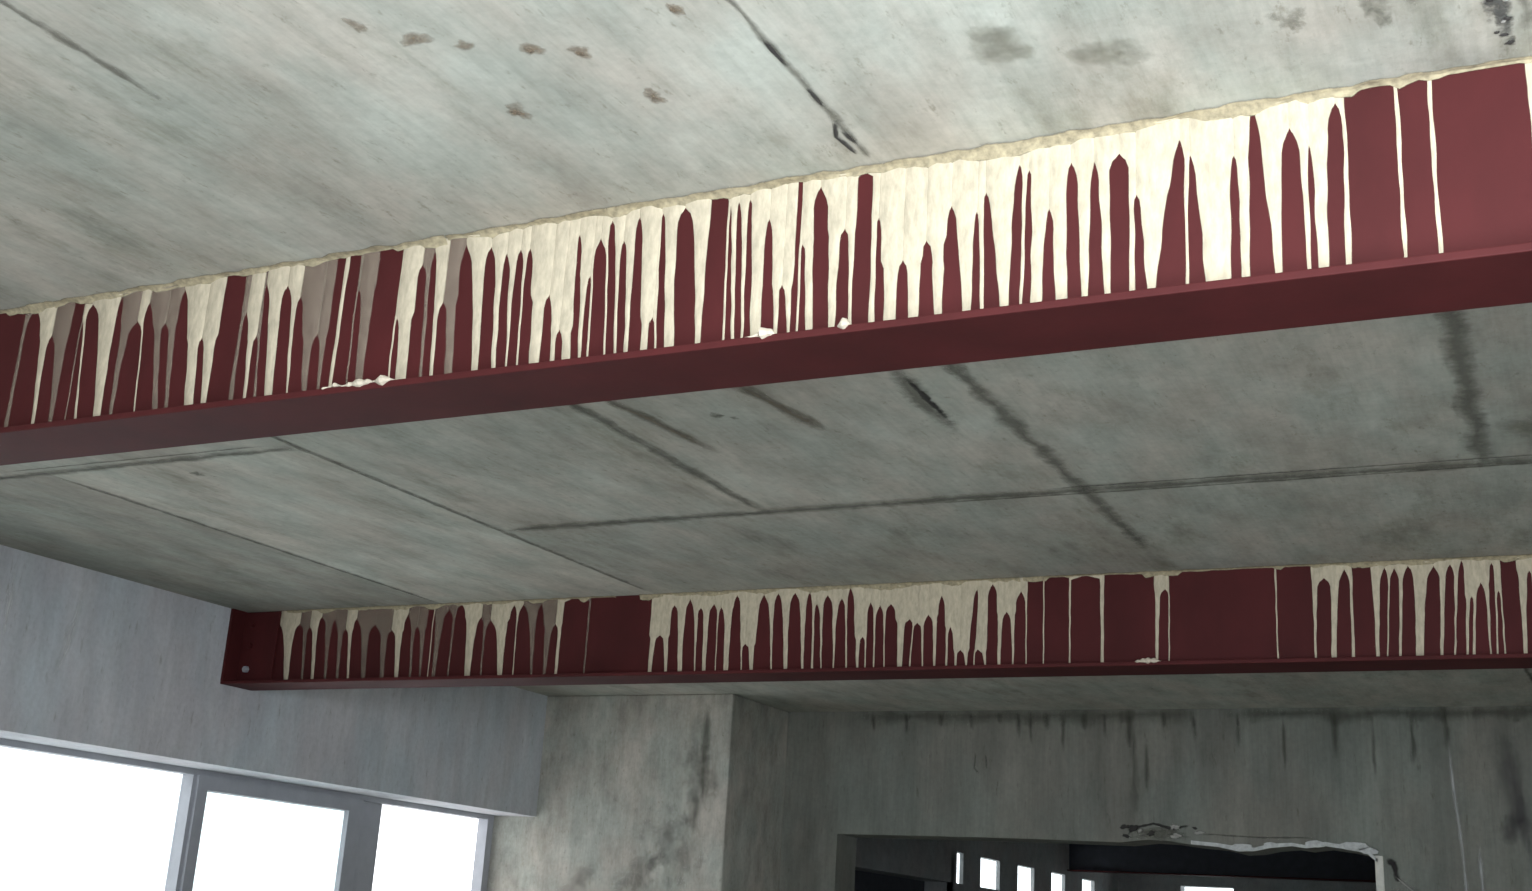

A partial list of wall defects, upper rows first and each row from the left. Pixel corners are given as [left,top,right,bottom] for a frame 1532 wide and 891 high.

crack [728,0,867,155]
peeling [1486,0,1515,45]
damp [0,56,1532,425]
damp [609,401,698,444]